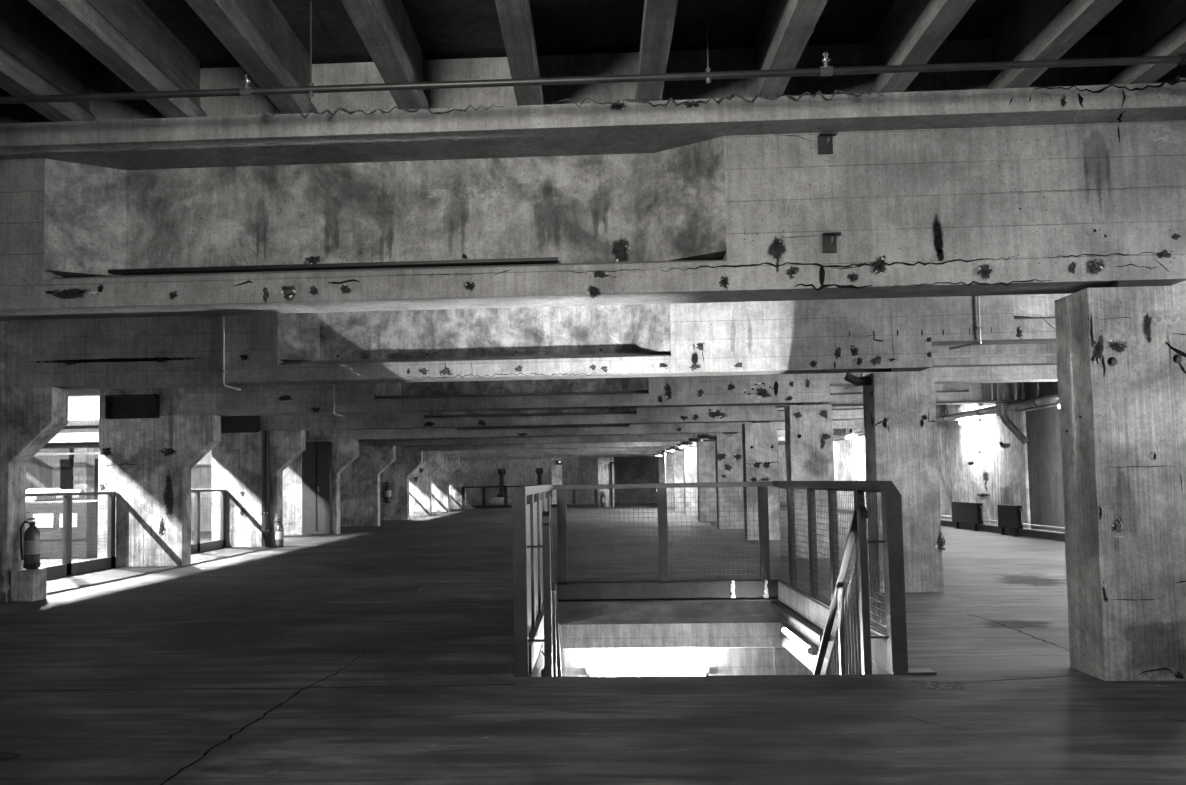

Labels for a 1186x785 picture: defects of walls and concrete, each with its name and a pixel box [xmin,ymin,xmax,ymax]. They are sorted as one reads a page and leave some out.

crack [1049,250,1174,258]
spalling [45,284,103,299]
spalling [1088,315,1127,364]
spalling [1165,342,1186,374]
spalling [728,360,817,403]